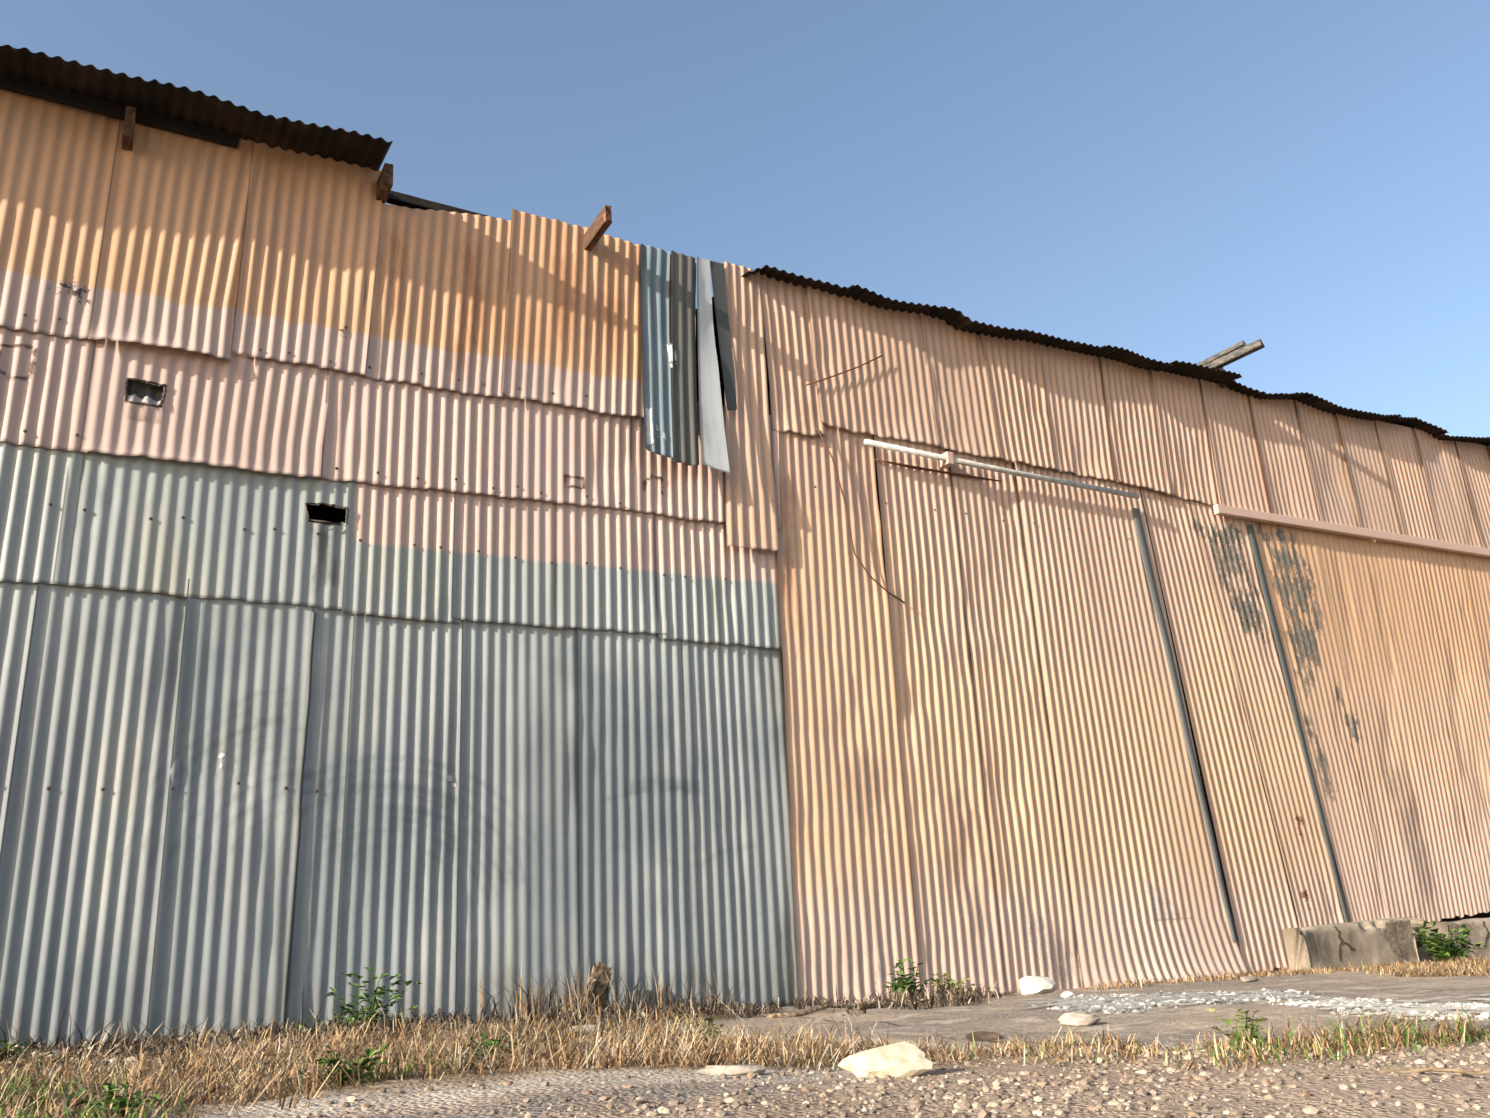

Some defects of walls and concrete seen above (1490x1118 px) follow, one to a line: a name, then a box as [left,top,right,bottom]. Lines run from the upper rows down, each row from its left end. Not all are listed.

peeling [49,277,90,304]
peeling [1192,518,1334,800]
peeling [1335,683,1362,748]